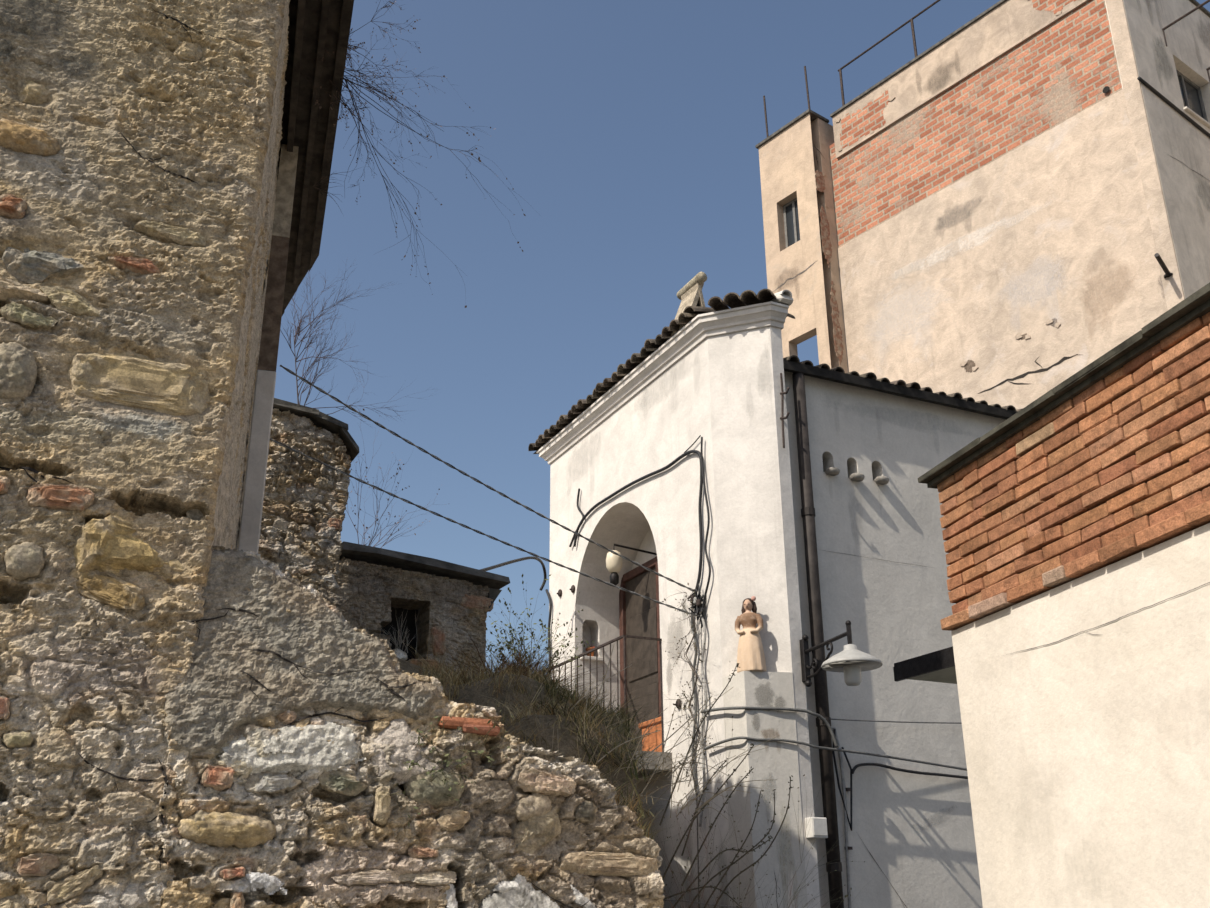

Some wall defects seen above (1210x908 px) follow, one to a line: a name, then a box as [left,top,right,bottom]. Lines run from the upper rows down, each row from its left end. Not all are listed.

crack [978,354,1078,394]
crack [1010,582,1210,654]